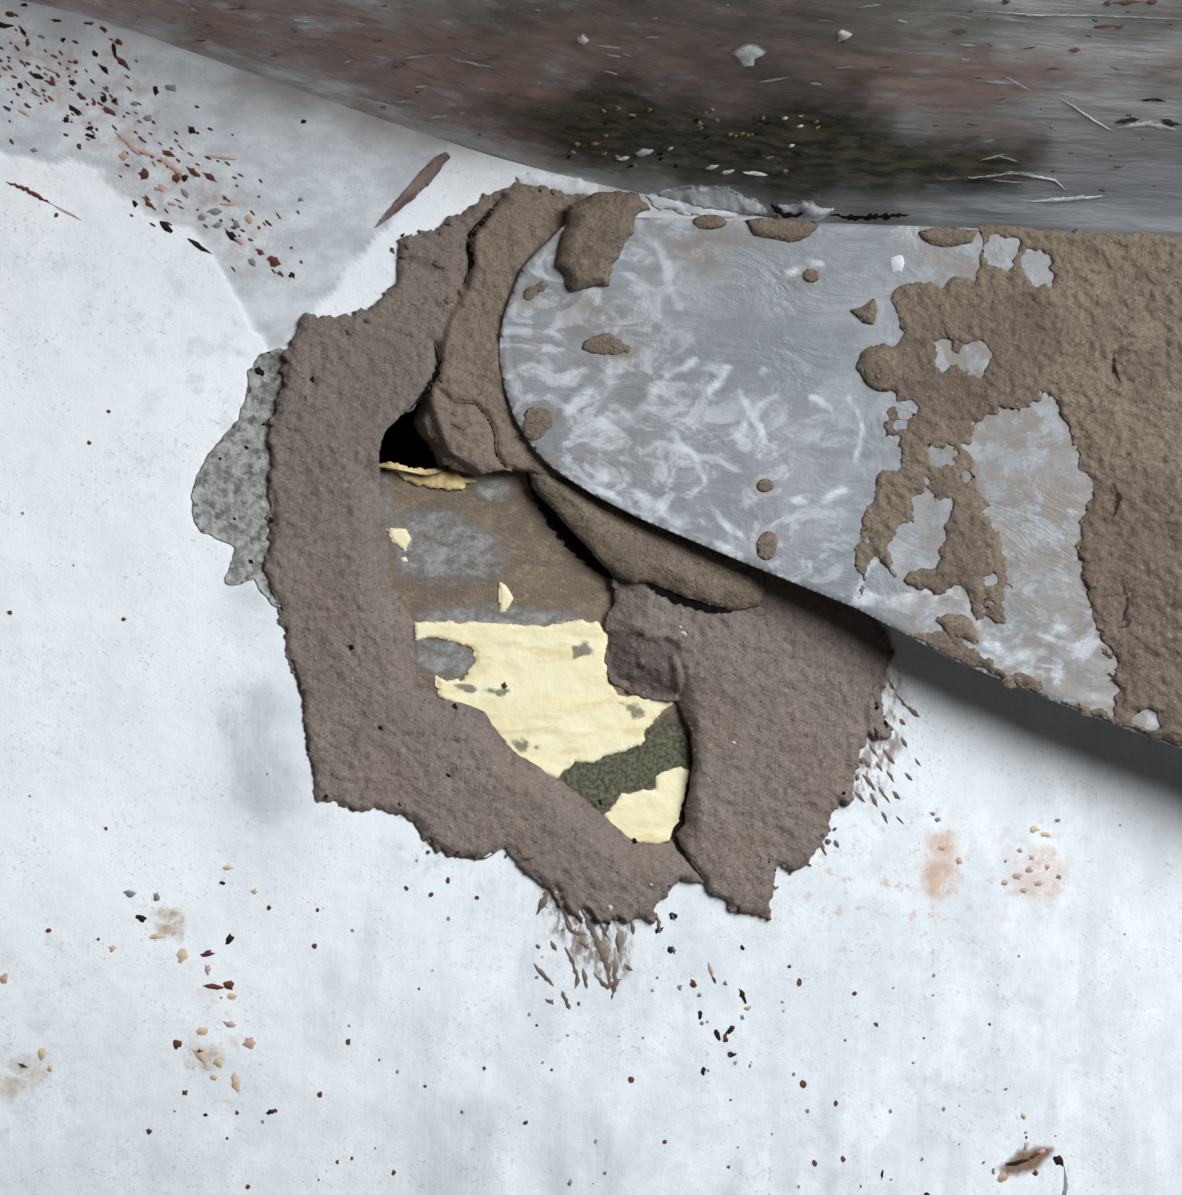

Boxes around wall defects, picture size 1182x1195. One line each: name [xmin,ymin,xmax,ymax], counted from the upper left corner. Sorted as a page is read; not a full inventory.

spalling [376,152,450,227]
leakage [88,0,1073,201]
spalling [192,348,286,607]
crack [402,343,529,475]
spalling [379,452,691,844]